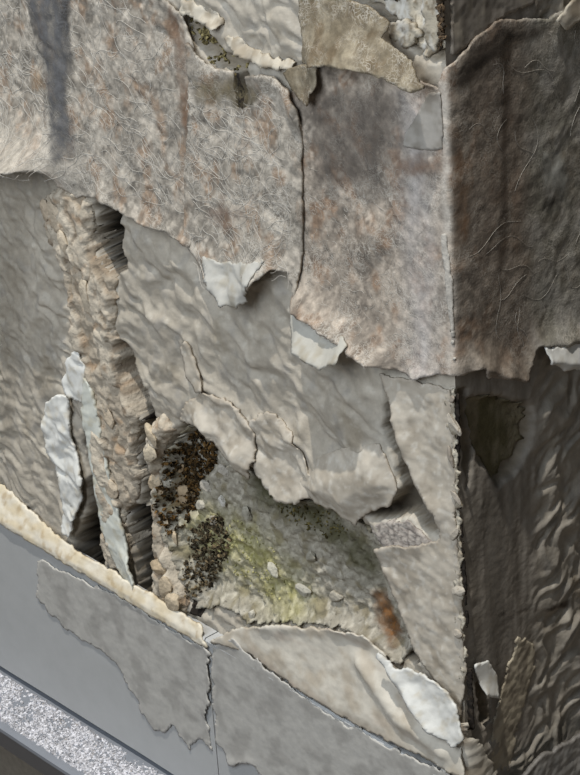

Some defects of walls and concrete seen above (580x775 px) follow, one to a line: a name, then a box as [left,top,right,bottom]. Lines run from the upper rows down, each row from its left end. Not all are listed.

spalling [371,0,446,57]
peeling [545,344,580,372]
crack [141,412,157,421]
spalling [36,188,526,775]
corrosion [375,593,401,640]
peeling [522,733,580,775]